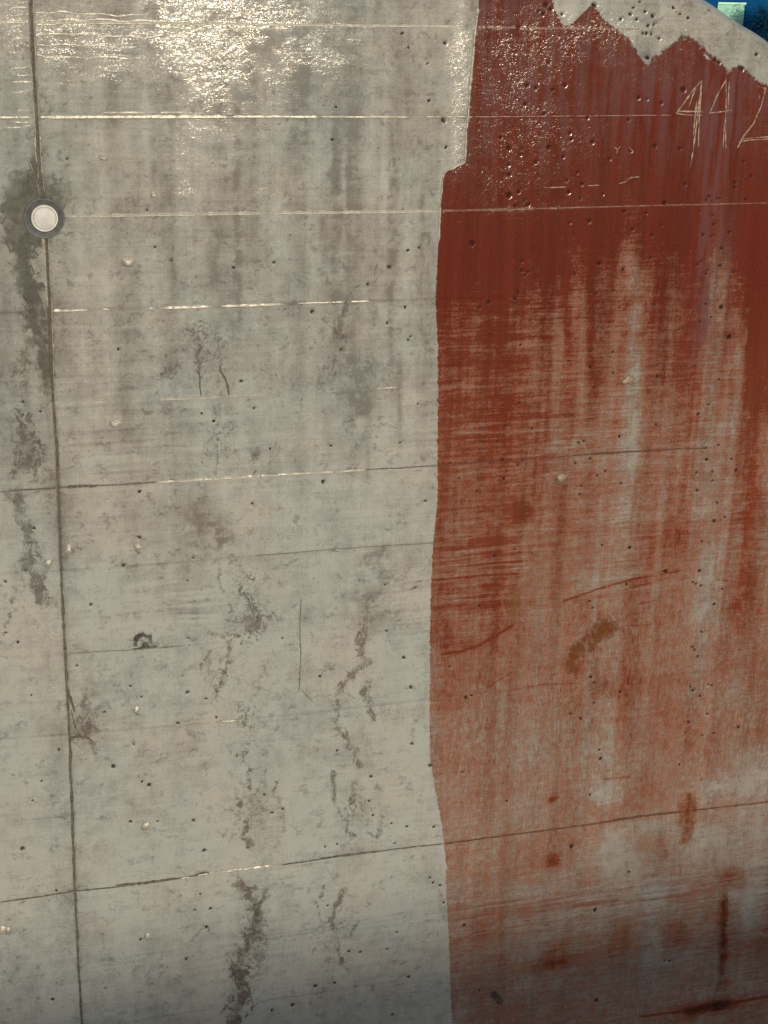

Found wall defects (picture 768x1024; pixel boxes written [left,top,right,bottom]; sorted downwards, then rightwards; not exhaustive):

leakage [0,153,58,395]
leakage [12,408,44,476]
leakage [21,525,50,604]